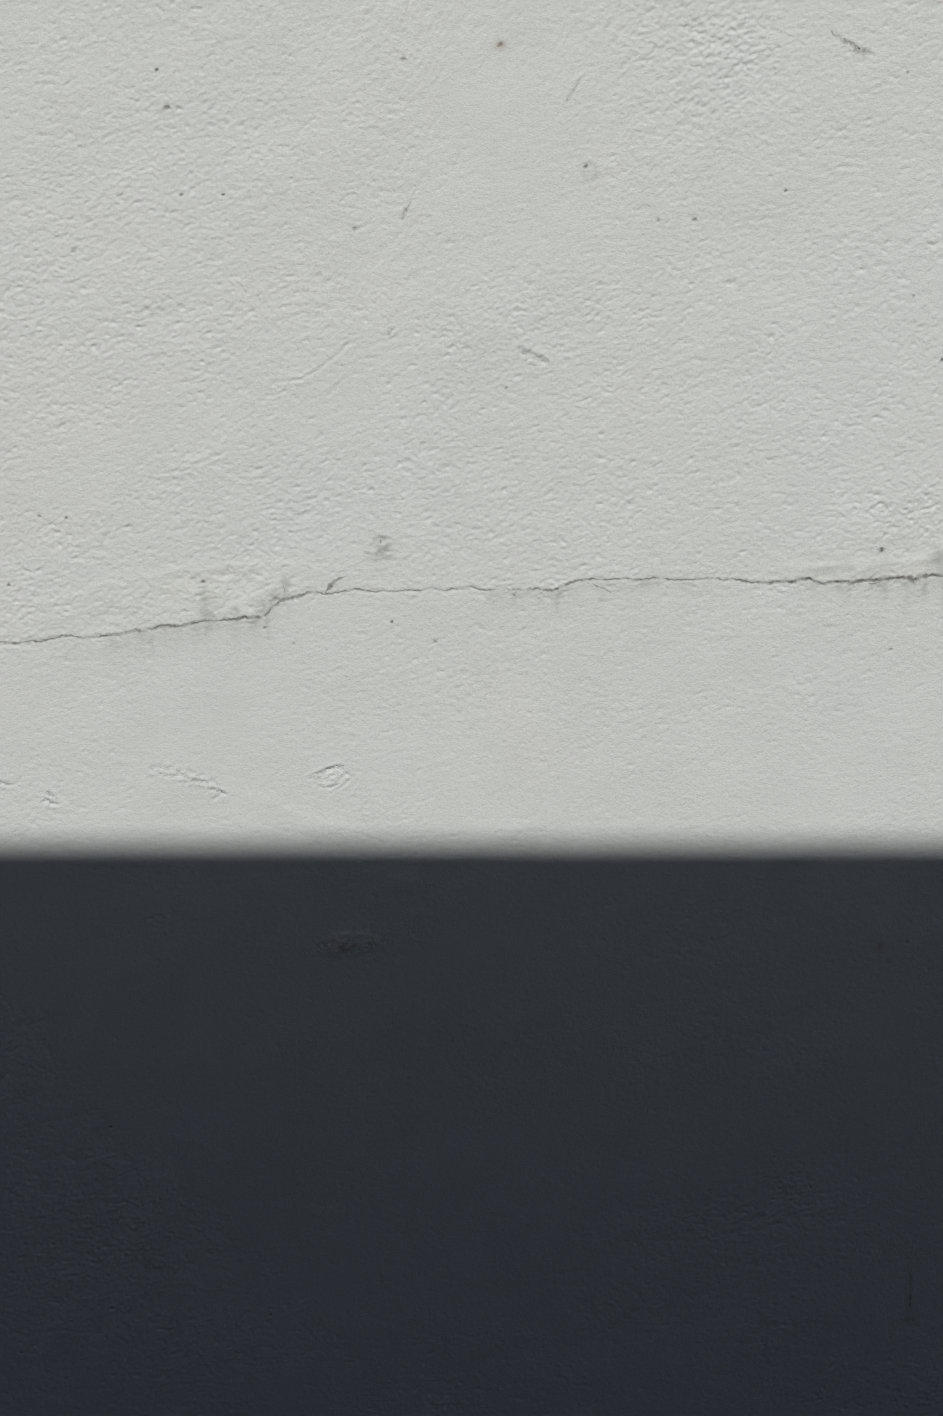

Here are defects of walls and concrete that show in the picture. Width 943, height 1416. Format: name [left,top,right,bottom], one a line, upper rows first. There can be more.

crack [0,573,943,645]